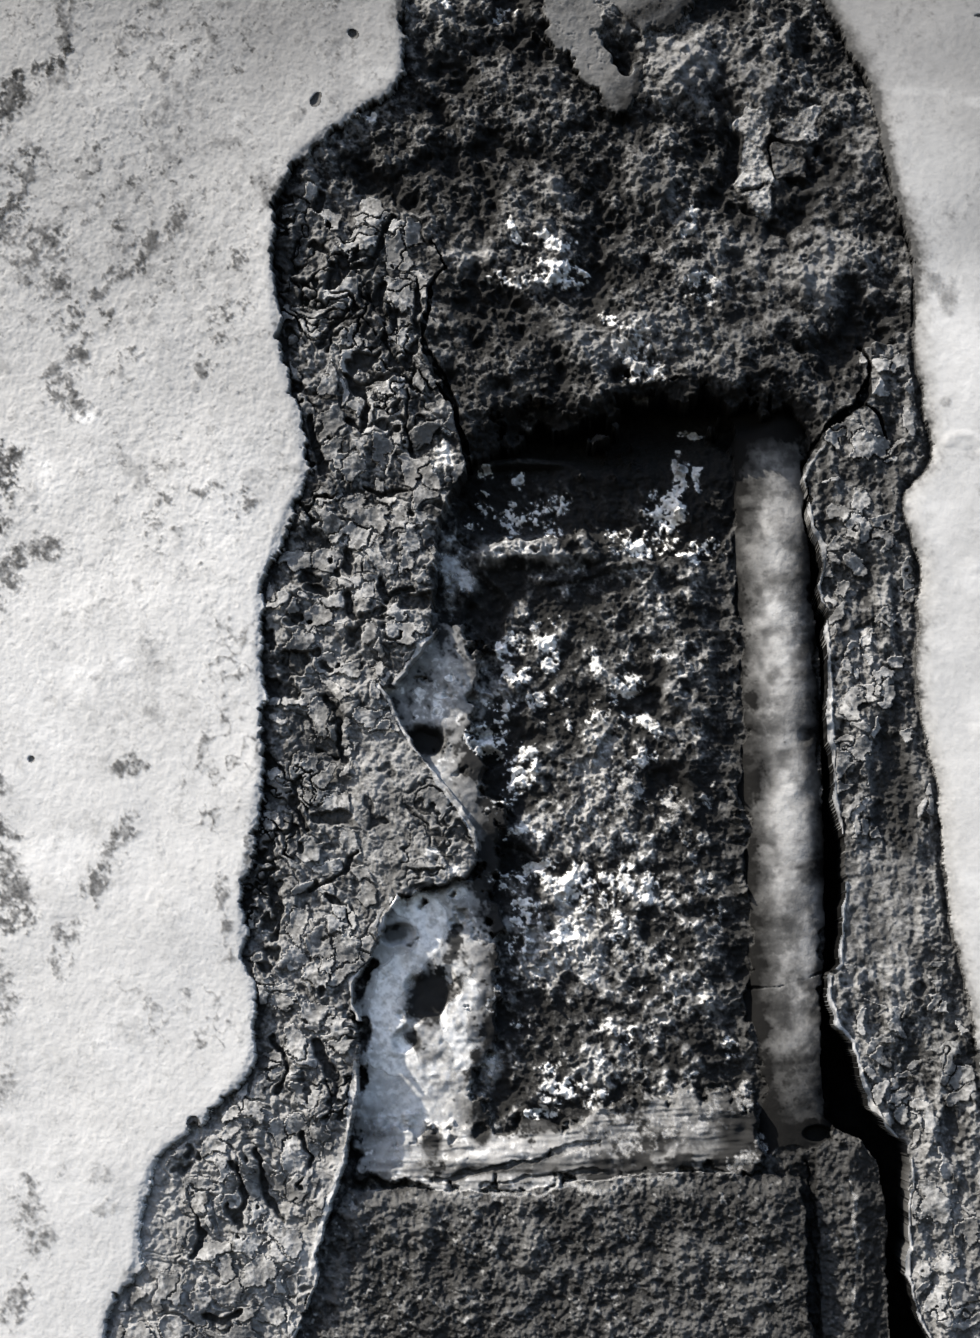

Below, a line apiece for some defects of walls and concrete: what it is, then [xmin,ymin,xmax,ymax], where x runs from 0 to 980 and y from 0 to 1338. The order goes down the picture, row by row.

water stain [0,27,73,130]
water stain [0,147,186,361]
crack [420,239,473,475]
crack [807,347,888,459]
water stain [0,438,22,533]
water stain [466,464,568,538]
water stain [605,432,719,565]
flaking render [288,0,980,1338]
peeling [105,181,479,1338]
water stain [463,615,727,966]
water stain [0,821,35,933]
water stain [524,1018,720,1158]